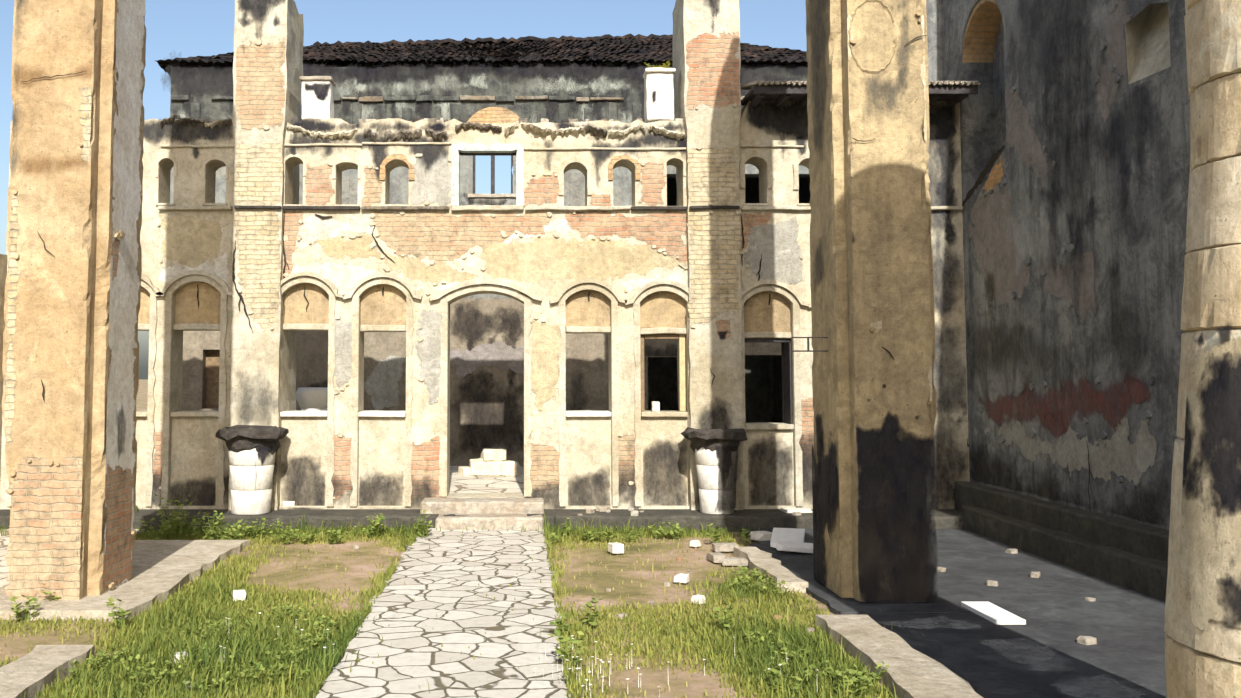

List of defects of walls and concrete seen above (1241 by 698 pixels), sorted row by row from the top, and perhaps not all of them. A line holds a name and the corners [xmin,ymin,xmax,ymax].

crack [21,71,86,82]
leakage [740,0,826,155]
peeling [157,31,804,339]
peeling [102,0,146,592]
crack [232,241,253,332]
crack [282,212,309,316]
peeling [364,309,560,410]
leakage [928,105,1081,509]
peeling [411,436,440,502]
leakage [531,442,700,509]
leakage [736,415,836,581]
peeling [1179,325,1241,632]